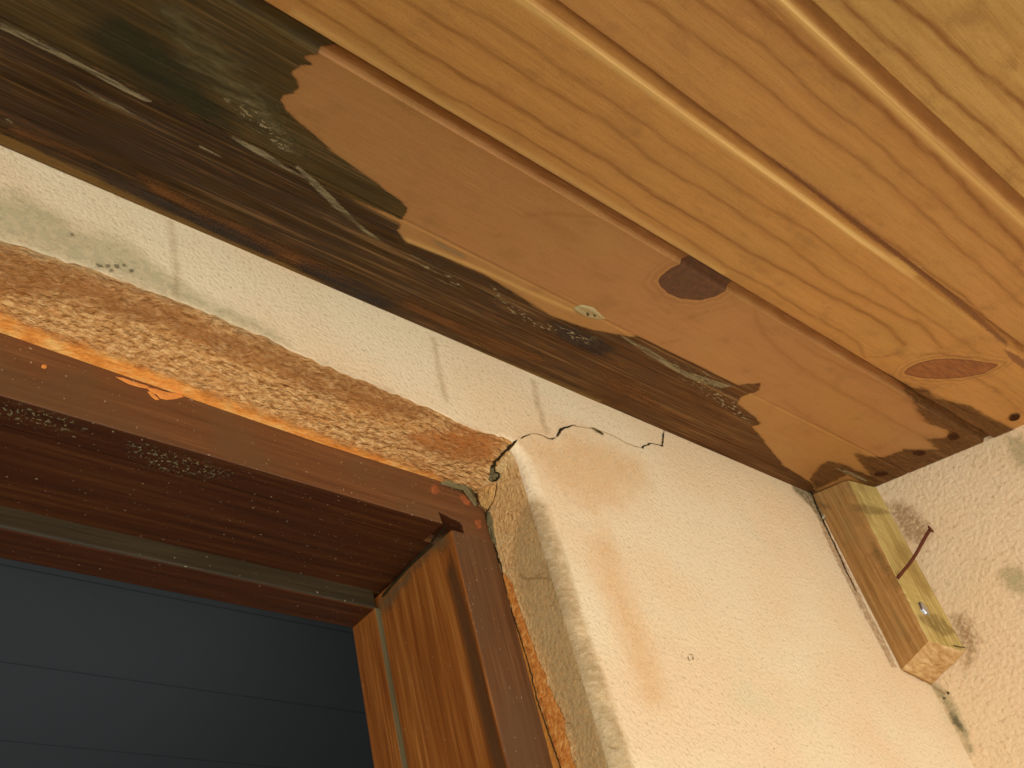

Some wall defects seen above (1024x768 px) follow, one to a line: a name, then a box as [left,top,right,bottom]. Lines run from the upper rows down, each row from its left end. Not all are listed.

leakage [0,0,1024,493]
crack [491,425,664,469]
mould [931,684,971,750]